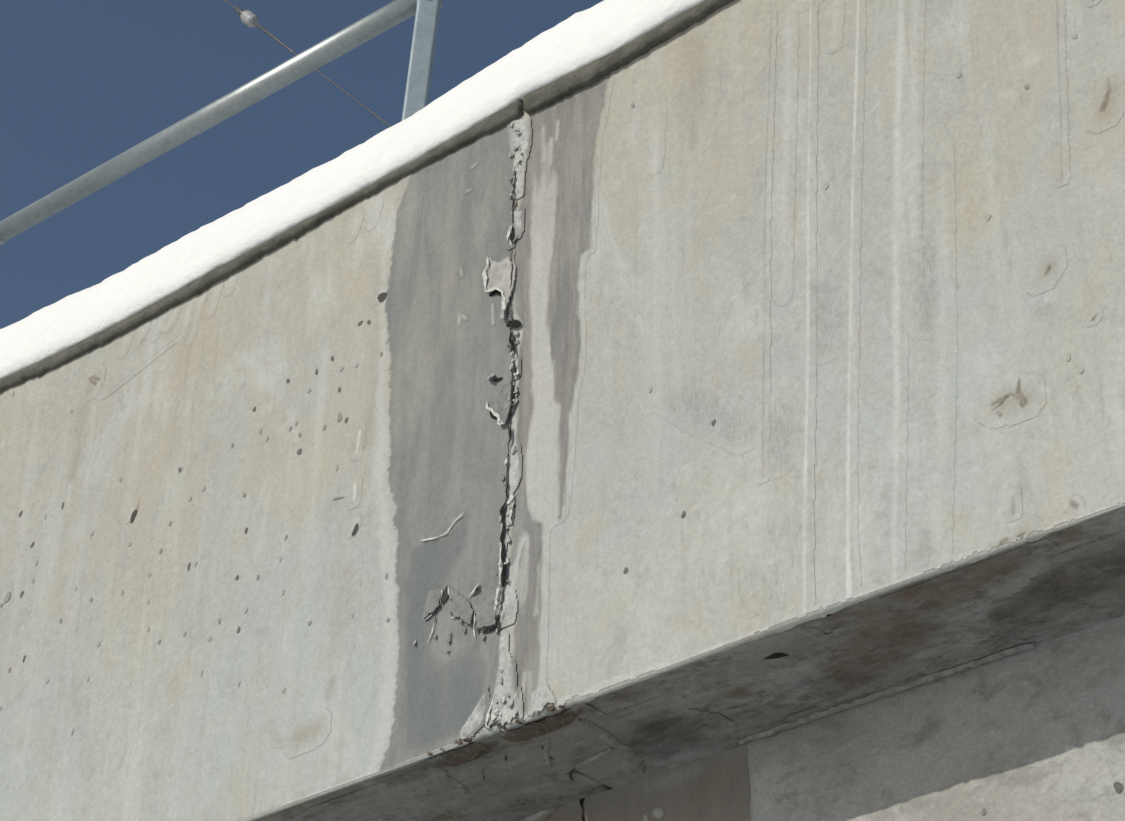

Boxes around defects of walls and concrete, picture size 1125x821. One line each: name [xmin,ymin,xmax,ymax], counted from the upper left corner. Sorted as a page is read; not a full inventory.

water stain [58,271,238,494]
water stain [319,70,616,791]
peeling [486,373,512,426]
crack [495,130,521,635]
crack [542,746,588,821]
spalling [280,495,1125,807]